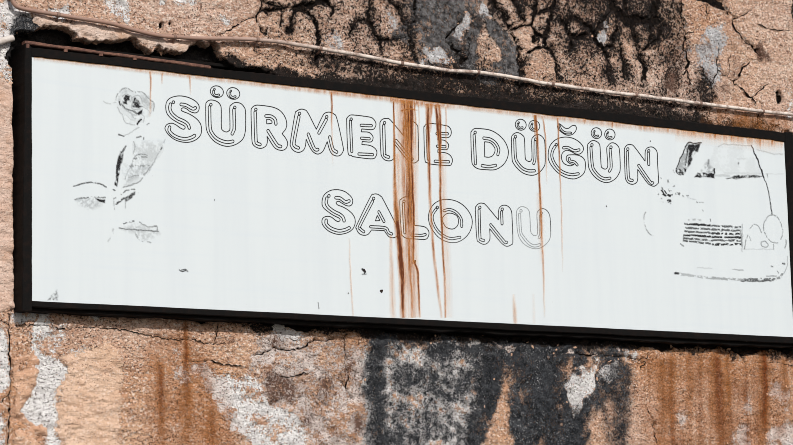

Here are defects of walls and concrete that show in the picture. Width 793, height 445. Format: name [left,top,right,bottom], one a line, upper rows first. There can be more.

spalling [0,0,221,84]
crack [219,0,335,62]
crack [349,0,416,53]
leakage [211,0,782,132]
crack [491,0,662,90]
crack [674,0,793,125]
peeling [0,308,70,445]
crack [0,310,351,444]
rust [183,322,208,406]
peeling [170,324,516,445]
leakage [233,323,793,445]
rust [661,352,789,445]